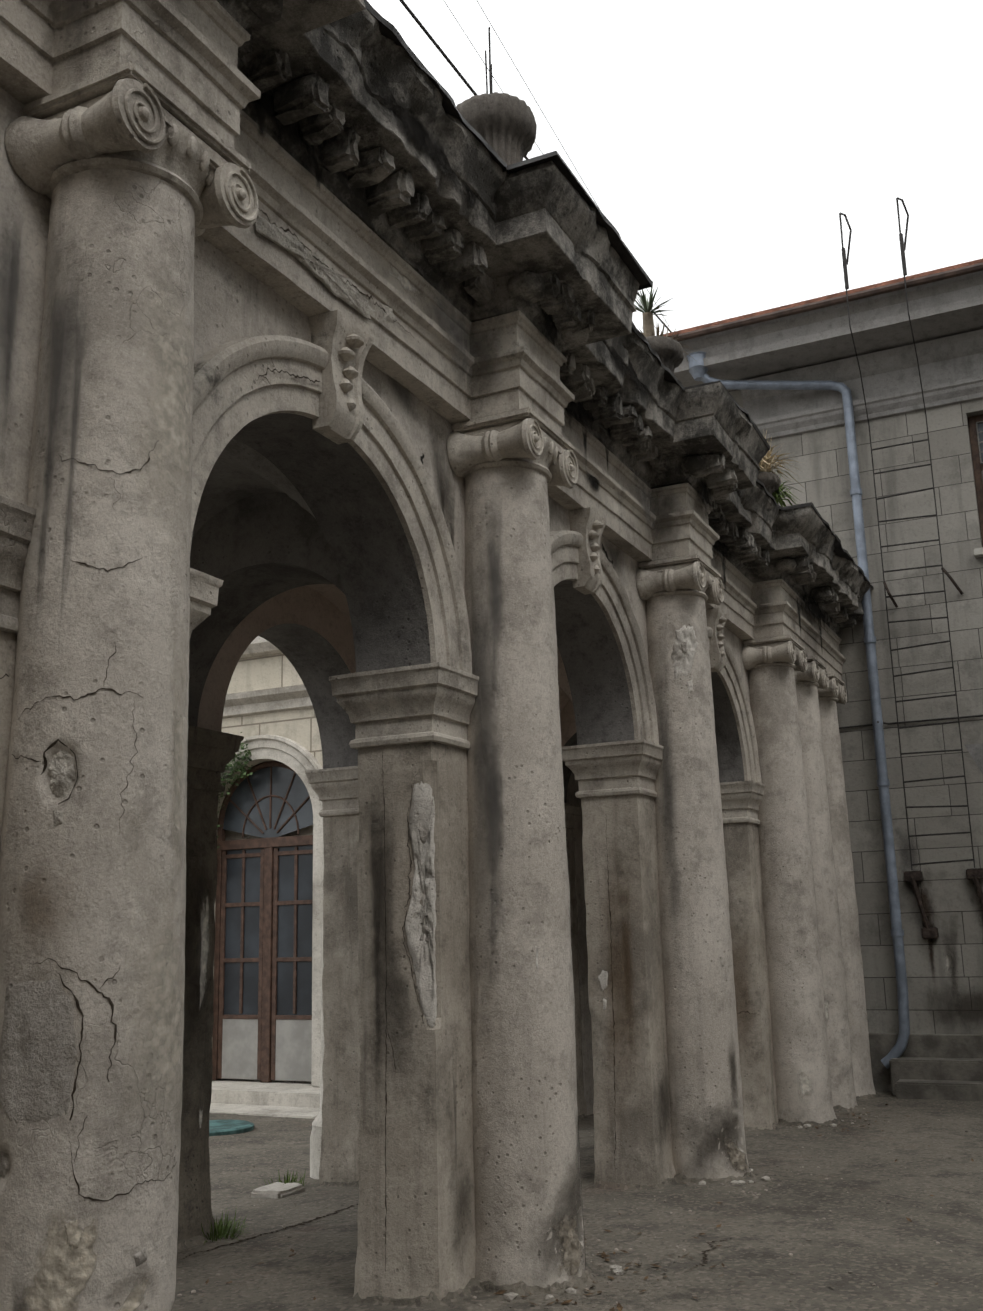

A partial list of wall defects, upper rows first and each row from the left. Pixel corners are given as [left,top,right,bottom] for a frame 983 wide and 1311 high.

crack [259,209,411,334]
crack [258,359,320,386]
crack [55,440,160,511]
crack [71,558,141,572]
crack [21,641,143,834]
spalling [41,739,78,827]
spalling [402,773,437,1027]
corrosion [913,884,934,971]
crack [33,958,121,1082]
crack [69,1117,177,1201]